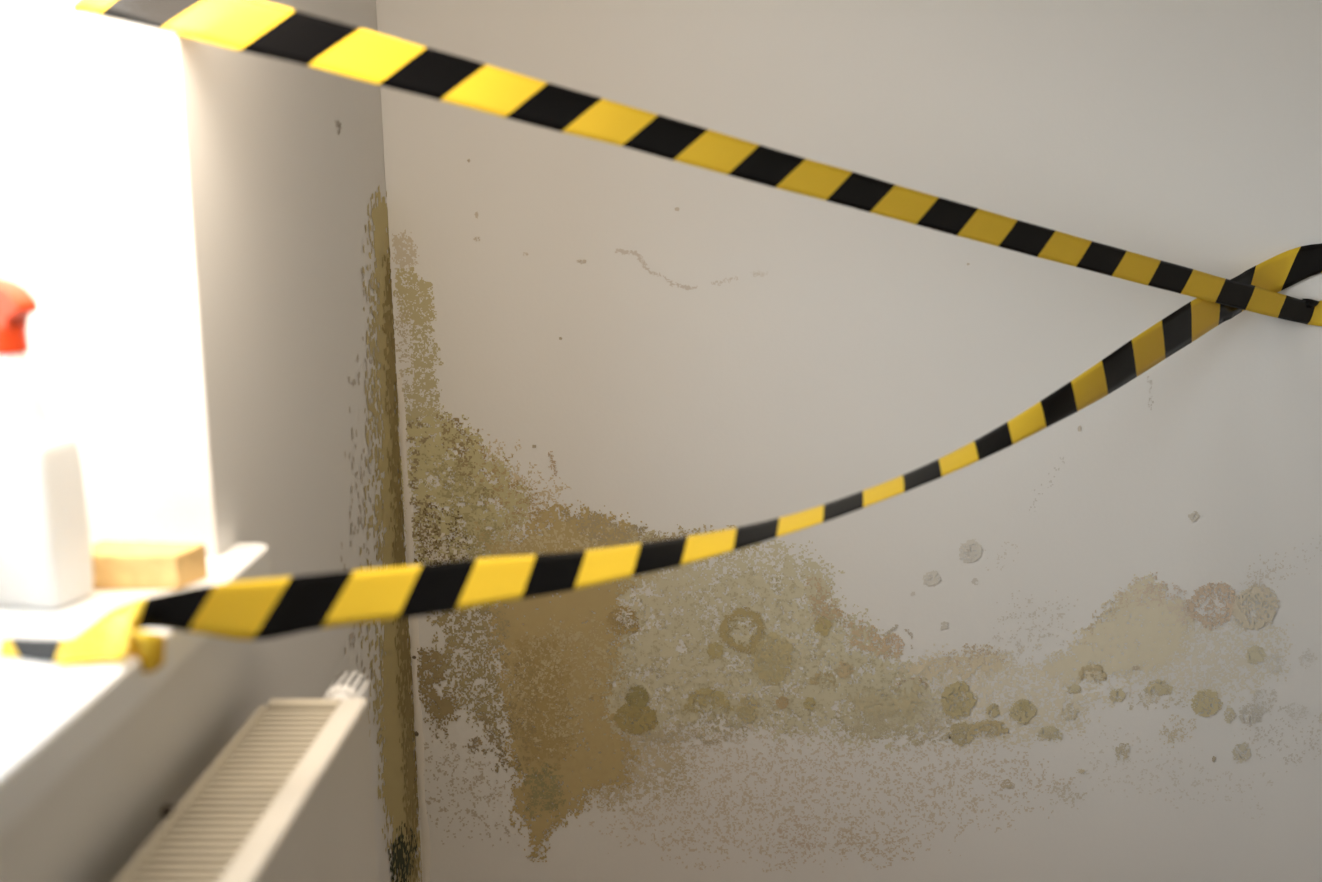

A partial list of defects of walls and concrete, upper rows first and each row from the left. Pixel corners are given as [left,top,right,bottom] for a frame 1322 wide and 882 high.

water stain [341,185,736,571]
water stain [344,535,1322,882]